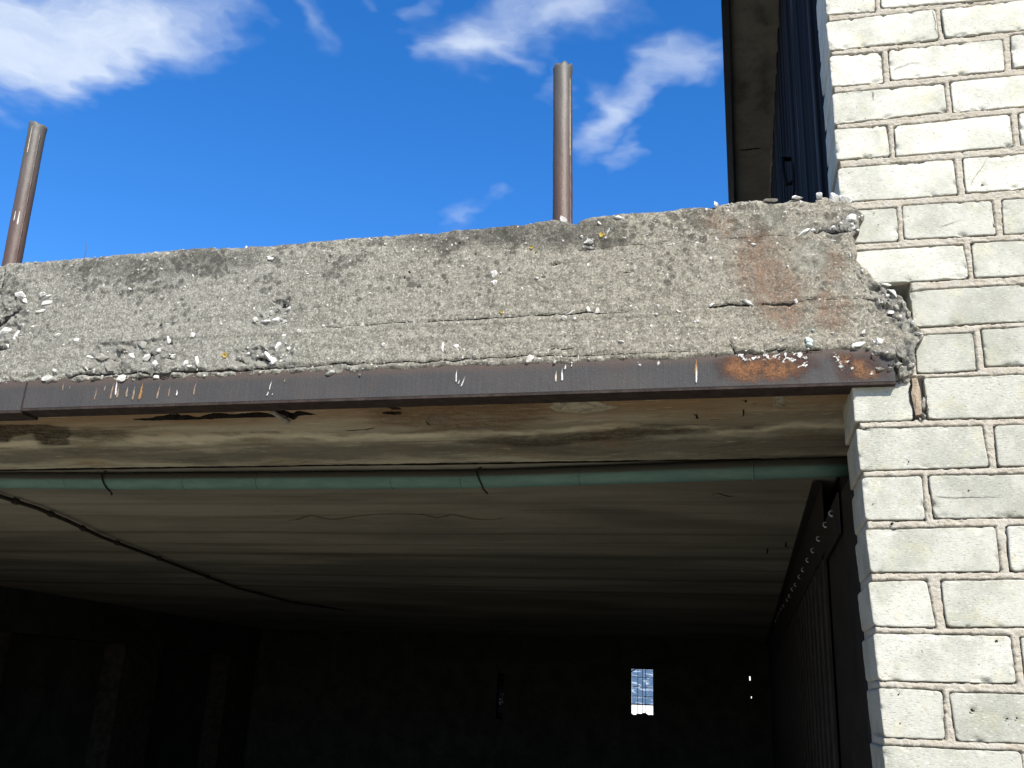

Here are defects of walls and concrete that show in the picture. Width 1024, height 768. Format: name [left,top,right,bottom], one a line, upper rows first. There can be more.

spalling [412,213,651,296]
crack [325,311,622,328]
spalling [430,298,600,365]
spalling [588,304,712,358]
crack [700,290,875,308]
spalling [818,253,924,373]
corrosion [723,355,810,378]